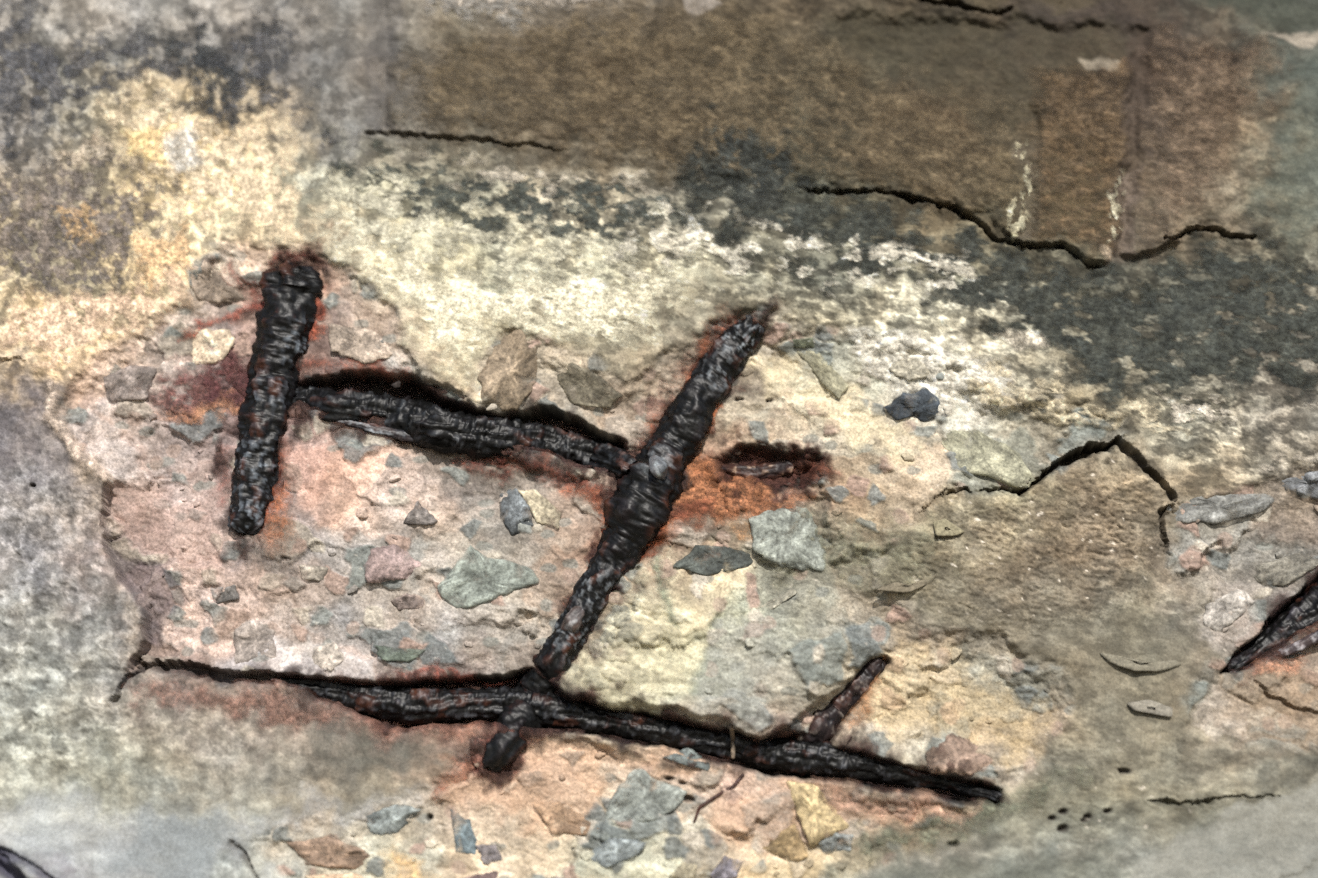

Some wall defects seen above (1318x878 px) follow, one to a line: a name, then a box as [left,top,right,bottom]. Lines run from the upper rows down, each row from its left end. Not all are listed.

crack [919,0,1014,16]
crack [807,185,1101,270]
crack [1163,224,1257,241]
corrosion [151,352,249,423]
corrosion [338,361,487,417]
corrosion [220,359,386,571]
corrosion [453,445,621,561]
spalling [57,241,1130,878]
corrosion [641,375,840,558]
crack [918,434,1179,553]
corrosion [150,664,600,787]
crack [0,845,54,878]